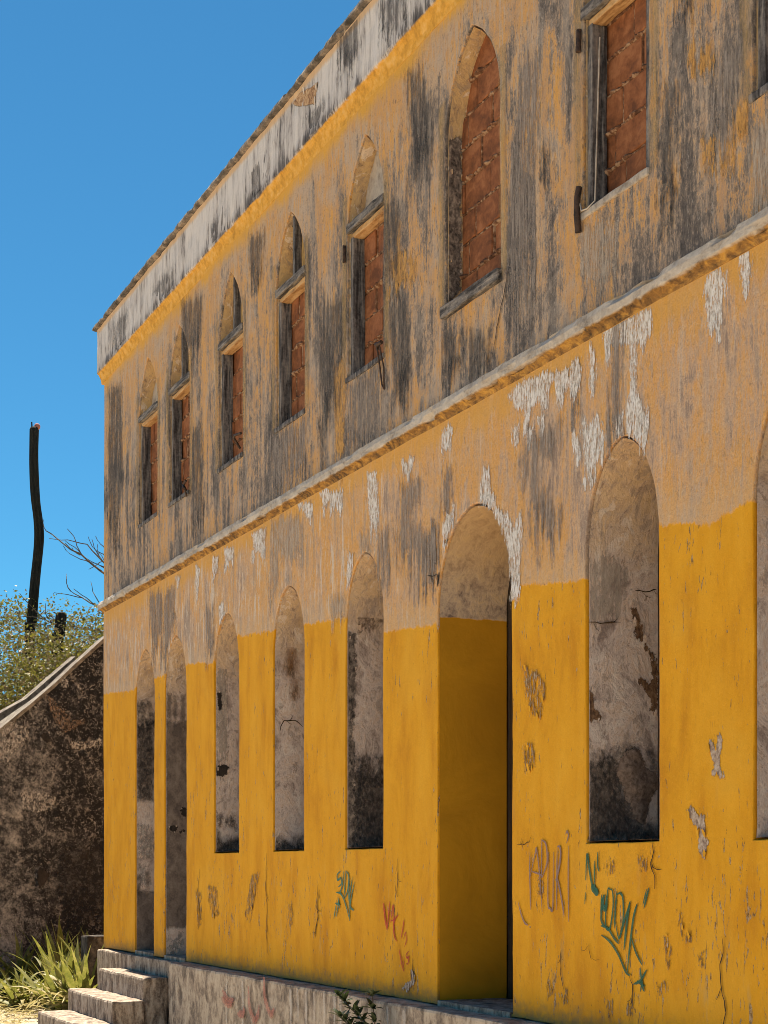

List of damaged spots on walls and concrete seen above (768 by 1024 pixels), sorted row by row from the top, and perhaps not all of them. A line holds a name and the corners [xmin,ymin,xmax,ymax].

flaking render [293,82,318,107]
leakage [505,44,548,354]
leakage [319,197,410,469]
peeling [508,308,654,491]
peeling [703,251,752,344]
leakage [107,386,123,560]
leakage [374,463,456,606]
peeling [480,465,523,609]
leakage [349,756,384,849]
leakage [590,746,658,843]
peeling [687,805,709,859]
peeling [707,732,725,779]